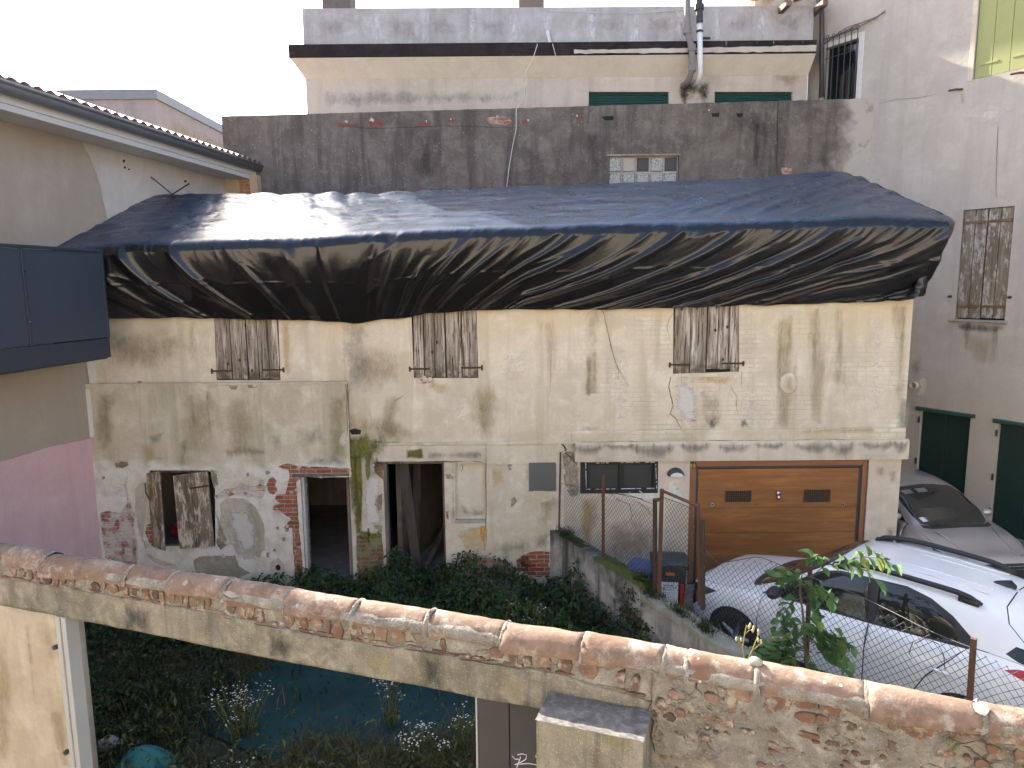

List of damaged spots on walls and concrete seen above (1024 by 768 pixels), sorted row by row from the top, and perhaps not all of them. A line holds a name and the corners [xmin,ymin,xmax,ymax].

flaking render [101,482,177,568]
peeling [193,463,352,578]
flaking render [458,526,558,581]